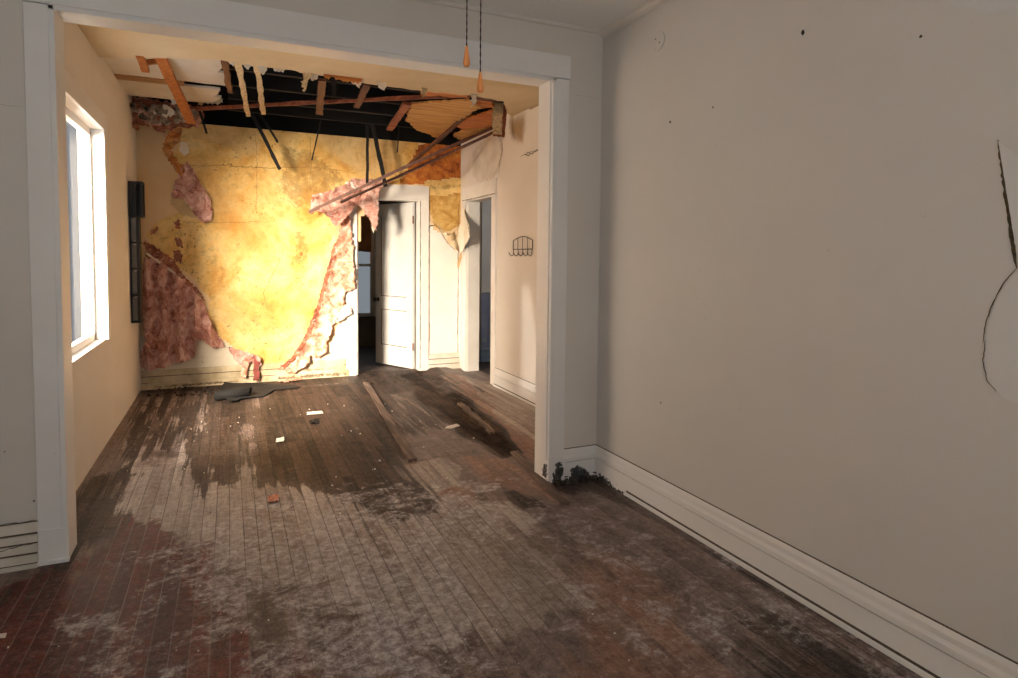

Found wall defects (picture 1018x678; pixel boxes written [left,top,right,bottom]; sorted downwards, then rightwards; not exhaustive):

peeling [229,62,285,75]
peeling [301,72,364,97]
peeling [472,135,503,182]
peeling [173,219,183,264]
peeling [983,140,1018,341]
peeling [425,177,461,363]
peeling [141,338,261,378]
peeling [285,317,346,374]